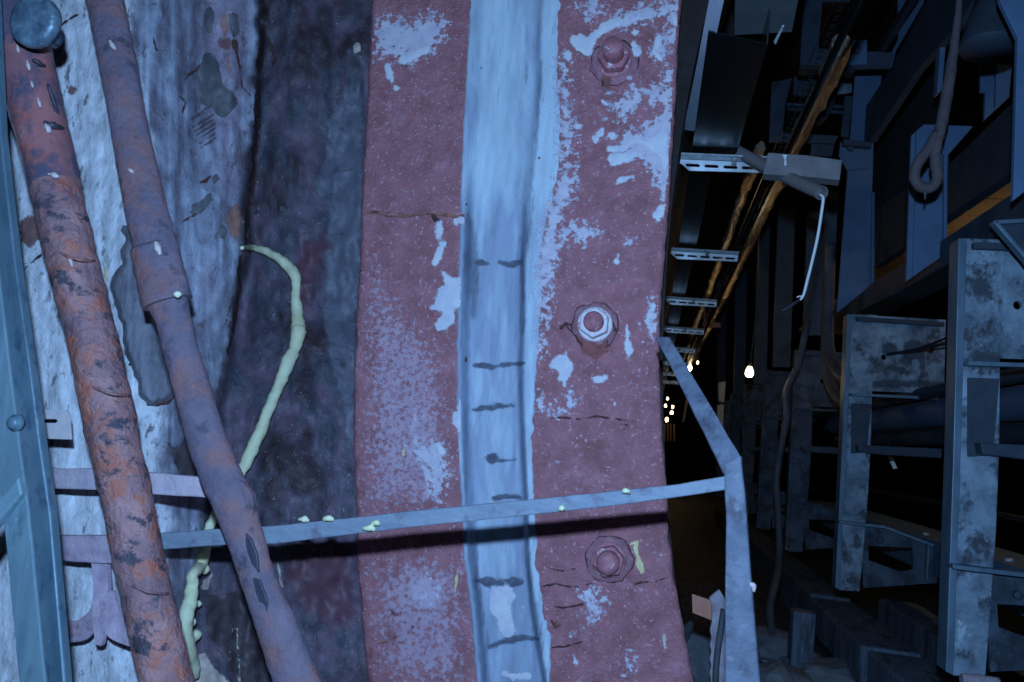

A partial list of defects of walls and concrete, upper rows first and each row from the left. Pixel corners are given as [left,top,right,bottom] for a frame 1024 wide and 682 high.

peeling [372,6,452,91]
spalling [185,52,238,117]
peeling [561,0,678,206]
crack [364,211,465,222]
peeling [551,581,612,638]
peeling [616,649,638,677]